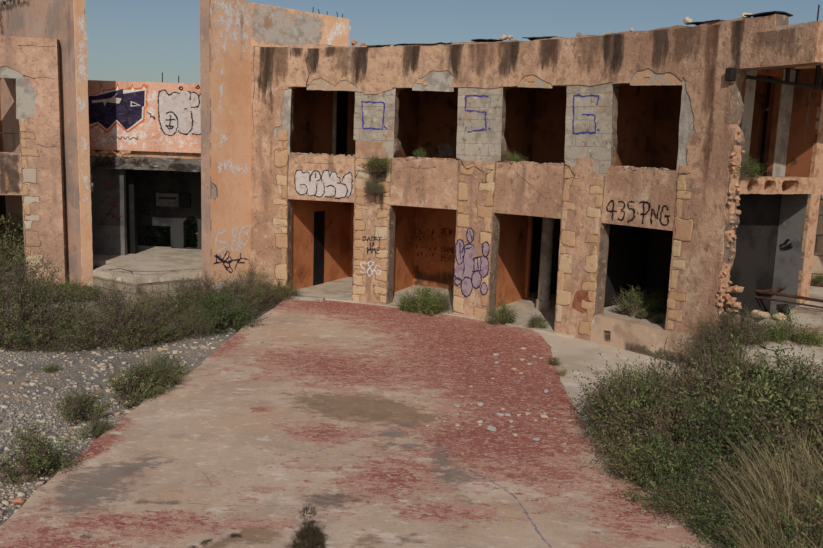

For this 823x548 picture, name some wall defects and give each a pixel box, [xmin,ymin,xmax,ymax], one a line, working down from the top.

peeling [0,66,37,121]
damp [258,47,274,108]
peeling [210,0,351,59]
damp [290,47,334,72]
damp [354,47,368,81]
damp [403,46,419,76]
damp [449,44,462,74]
damp [499,41,519,75]
damp [540,39,557,68]
damp [604,33,624,71]
damp [652,29,669,64]
peeling [412,70,503,162]